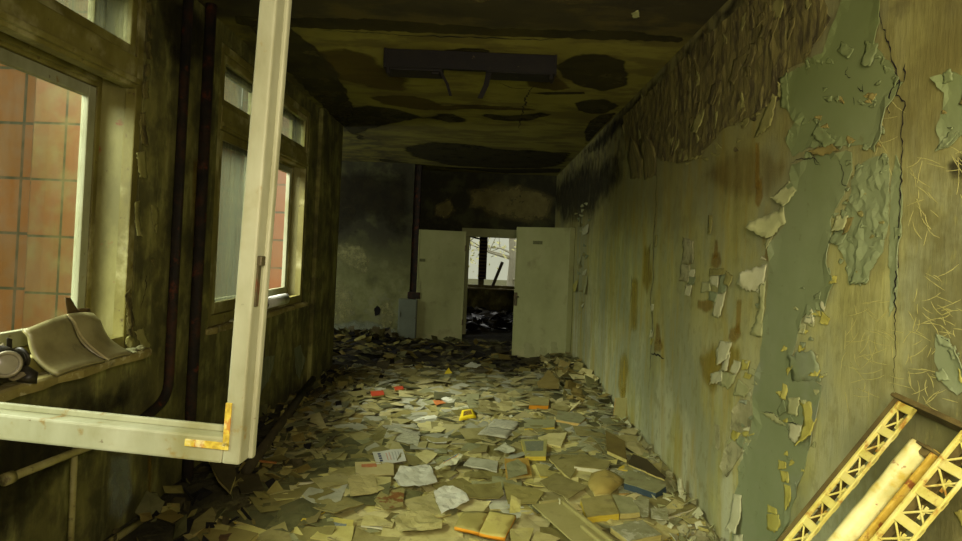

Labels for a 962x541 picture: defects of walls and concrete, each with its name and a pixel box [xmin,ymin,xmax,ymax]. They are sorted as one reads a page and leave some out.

peeling [622,0,903,541]
crack [879,0,906,388]
peeling [934,334,962,395]
damp [950,158,962,174]